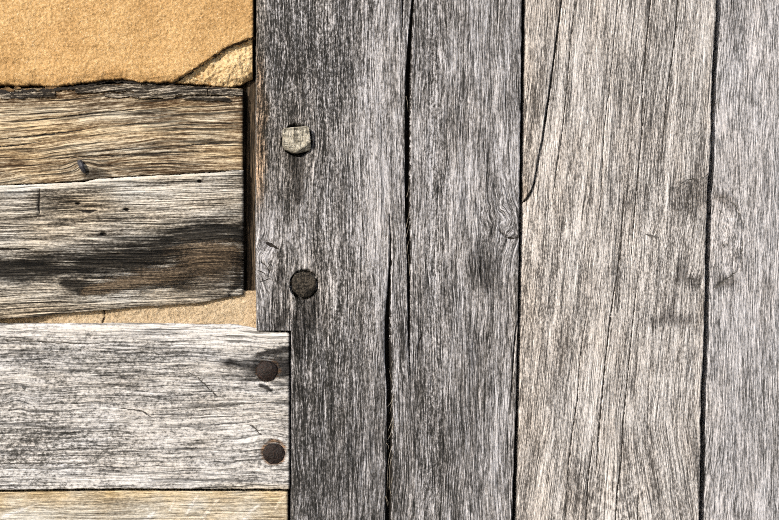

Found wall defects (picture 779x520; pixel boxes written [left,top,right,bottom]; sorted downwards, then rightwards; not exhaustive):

crack [521,0,576,204]